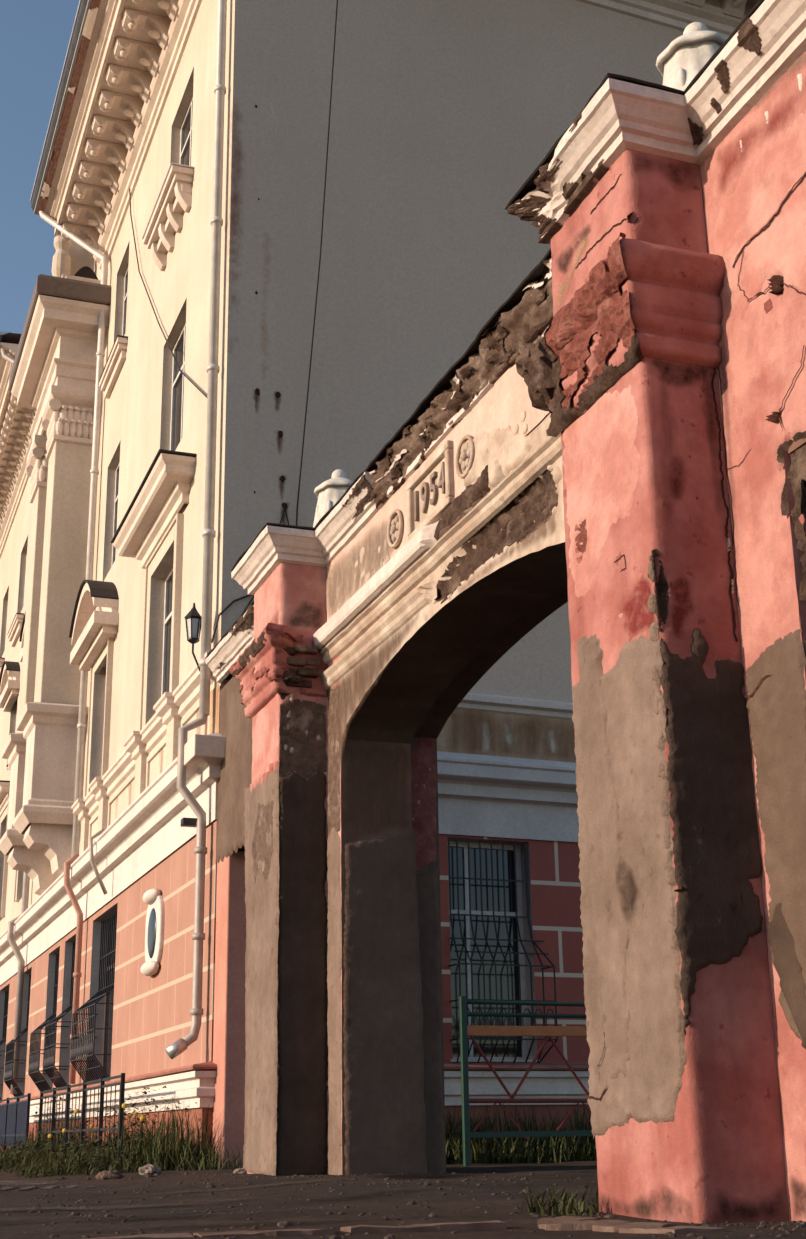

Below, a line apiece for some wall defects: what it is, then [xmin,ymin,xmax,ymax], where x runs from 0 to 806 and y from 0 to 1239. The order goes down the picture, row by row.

peeling [688,117,704,146]
peeling [710,59,729,114]
peeling [737,17,761,56]
crack [575,174,638,269]
crack [731,169,806,314]
flaking render [369,158,636,502]
crack [765,345,805,430]
flaking render [434,428,532,541]
spalling [429,465,562,605]
crack [711,367,751,642]
spalling [776,431,806,601]
flaking render [250,641,342,1175]